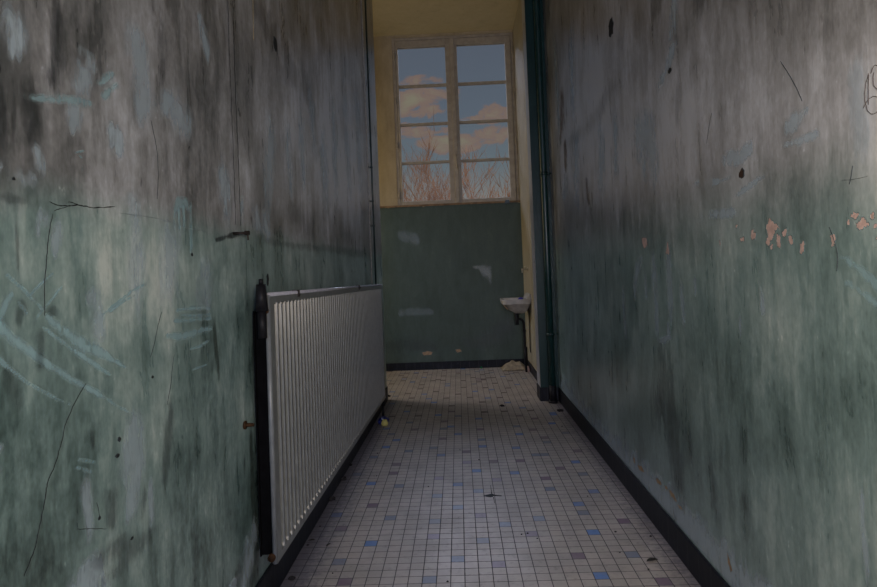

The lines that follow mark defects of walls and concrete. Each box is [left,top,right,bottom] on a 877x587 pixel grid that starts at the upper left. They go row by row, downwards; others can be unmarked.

peeling [735,217,805,255]